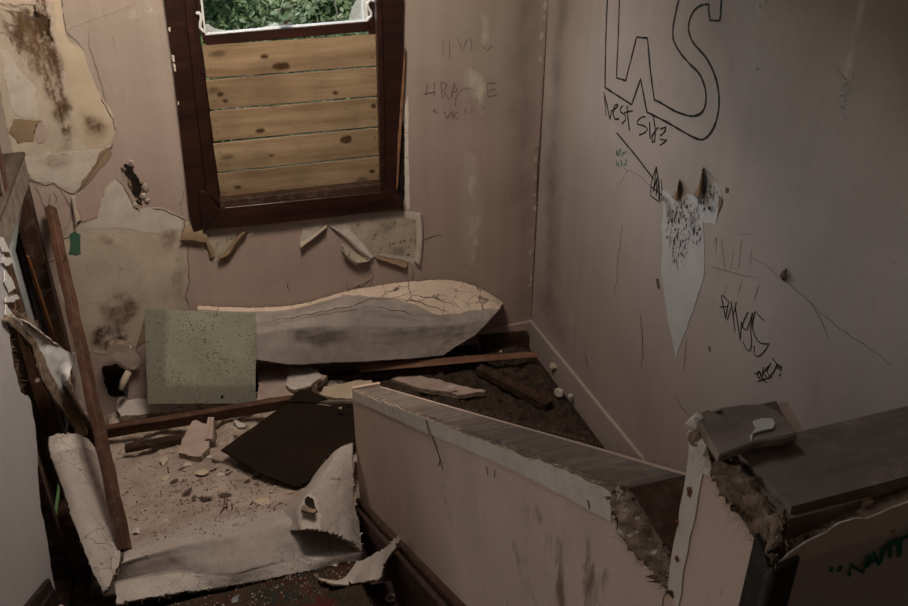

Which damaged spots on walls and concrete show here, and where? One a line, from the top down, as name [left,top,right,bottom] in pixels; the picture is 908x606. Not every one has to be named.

peeling [0,0,116,194]
peeling [64,159,190,354]
peeling [205,97,424,270]
peeling [656,168,729,358]
spalling [102,364,125,397]
crack [425,419,443,469]
flaking render [603,484,674,605]
flaking render [685,410,790,570]